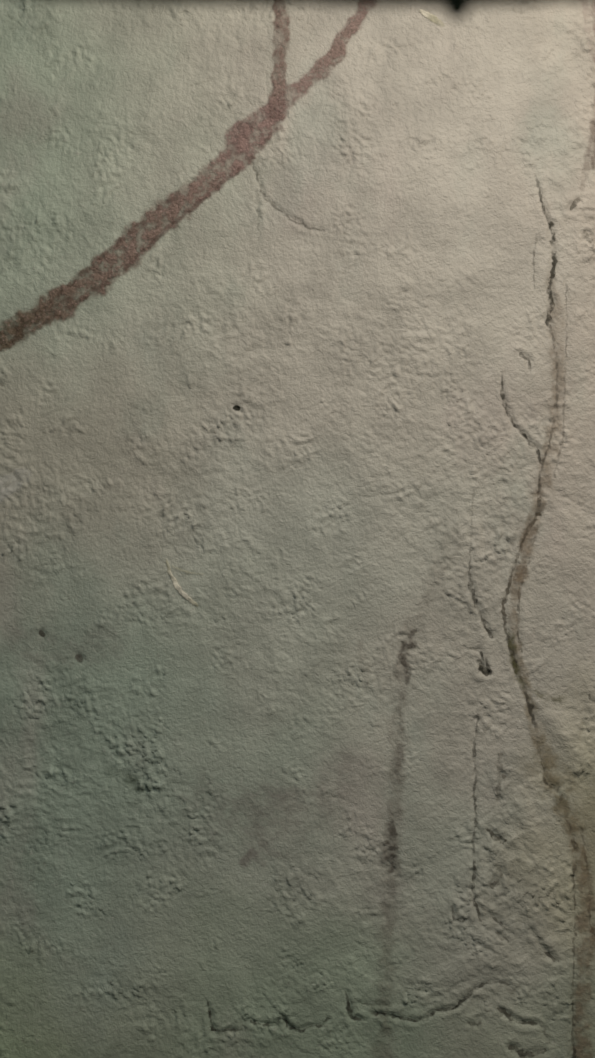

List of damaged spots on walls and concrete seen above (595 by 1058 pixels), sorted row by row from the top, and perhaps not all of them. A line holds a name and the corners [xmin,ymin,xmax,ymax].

crack [540,196,557,325]
crack [501,381,541,461]
crack [468,580,535,720]
crack [472,861,497,921]
crack [208,1010,321,1032]
crack [346,984,482,1022]